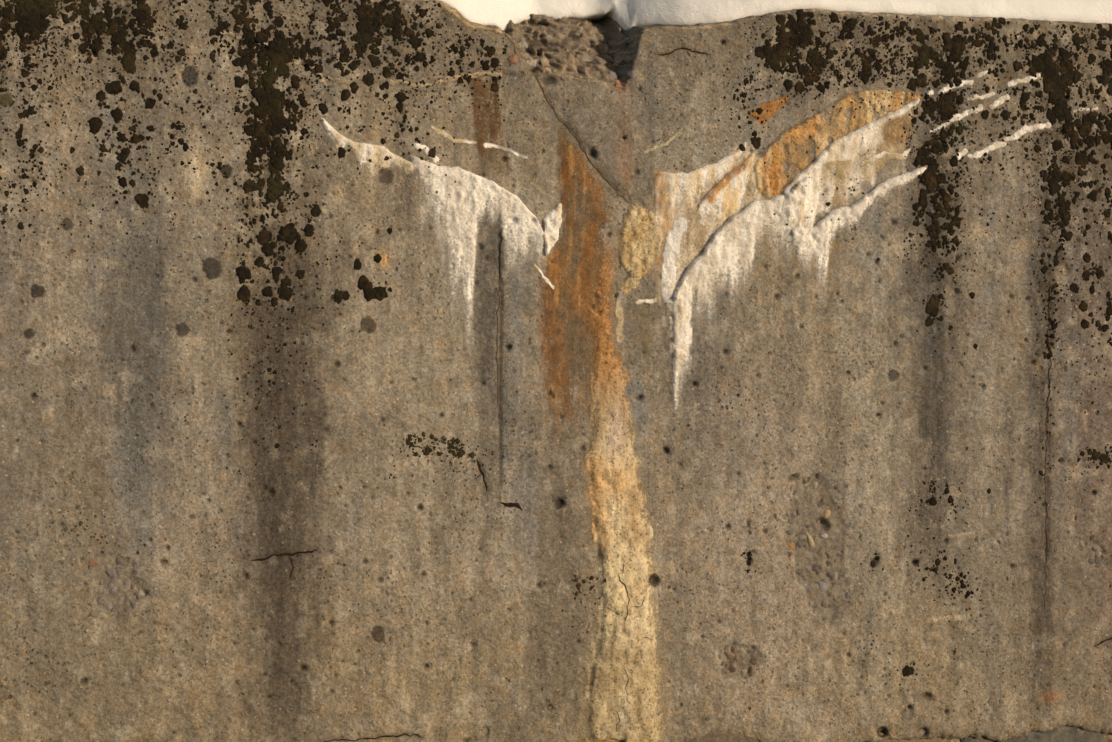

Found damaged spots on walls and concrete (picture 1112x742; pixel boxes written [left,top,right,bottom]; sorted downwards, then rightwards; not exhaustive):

leakage [293,58,353,85]
leakage [321,118,562,318]
leakage [387,71,502,88]
rust [541,128,609,421]
crack [532,73,629,203]
leakage [556,71,1051,742]